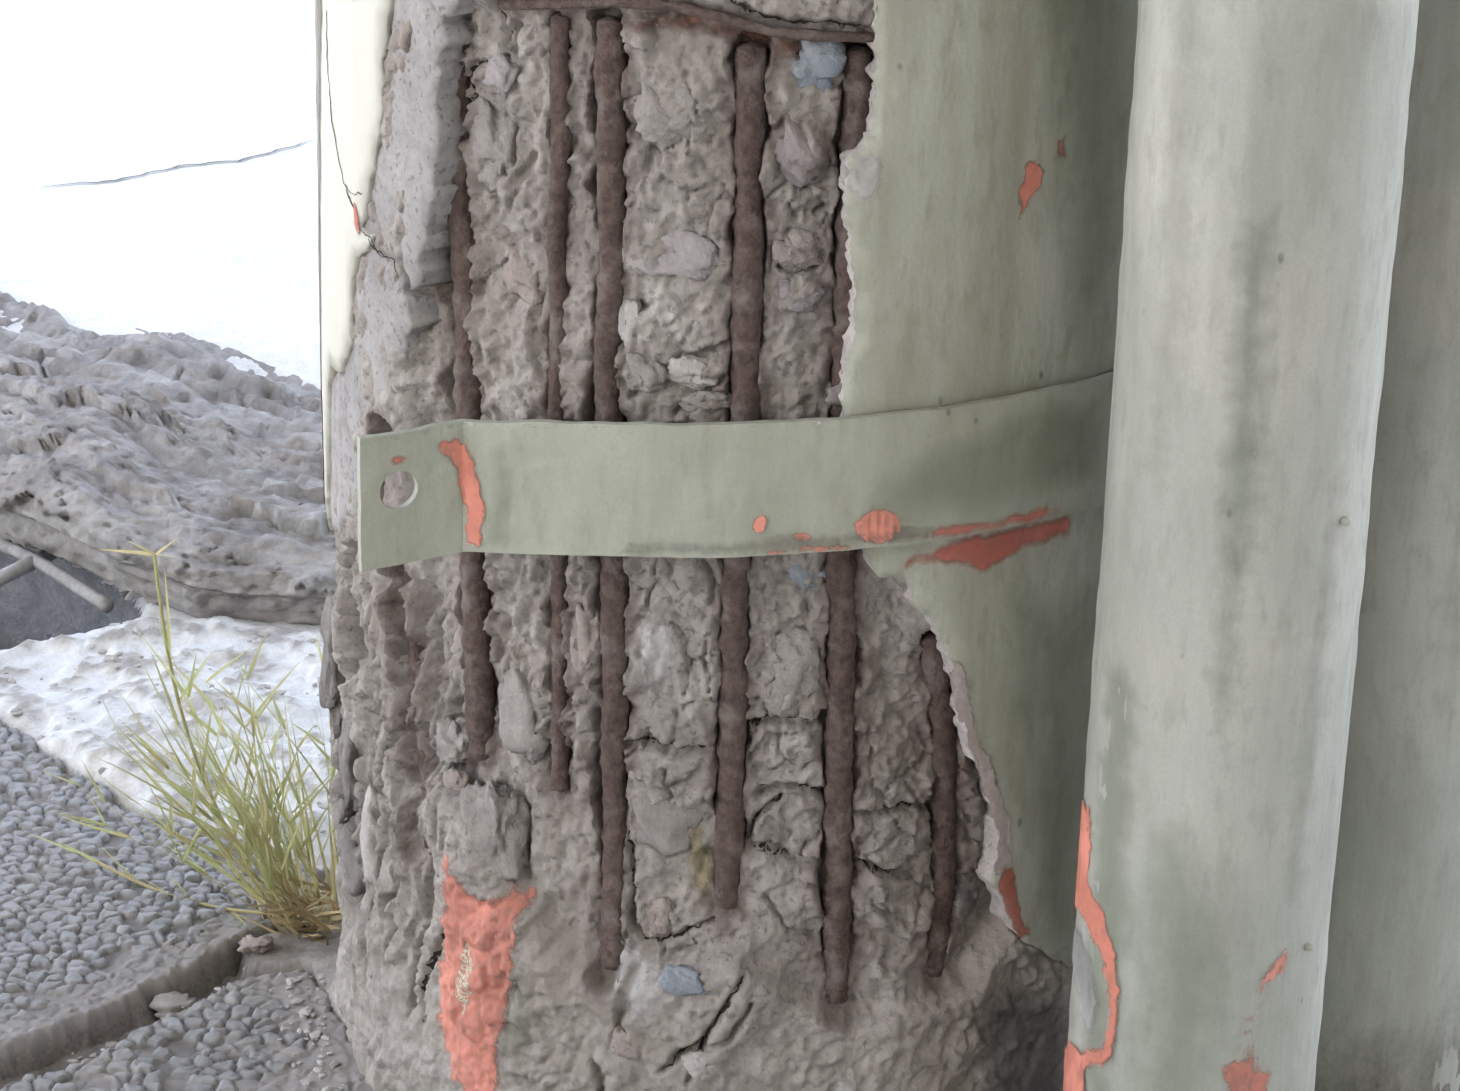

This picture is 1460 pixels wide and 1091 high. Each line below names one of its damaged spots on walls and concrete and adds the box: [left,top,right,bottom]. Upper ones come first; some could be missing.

rust [626,13,802,56]
spalling [319,0,1120,1091]
crack [627,735,706,749]
crack [749,782,819,858]
crack [861,801,918,810]
crack [856,857,896,874]
peeling [1258,949,1287,993]
crack [664,976,743,1077]
peeling [1222,1057,1271,1091]